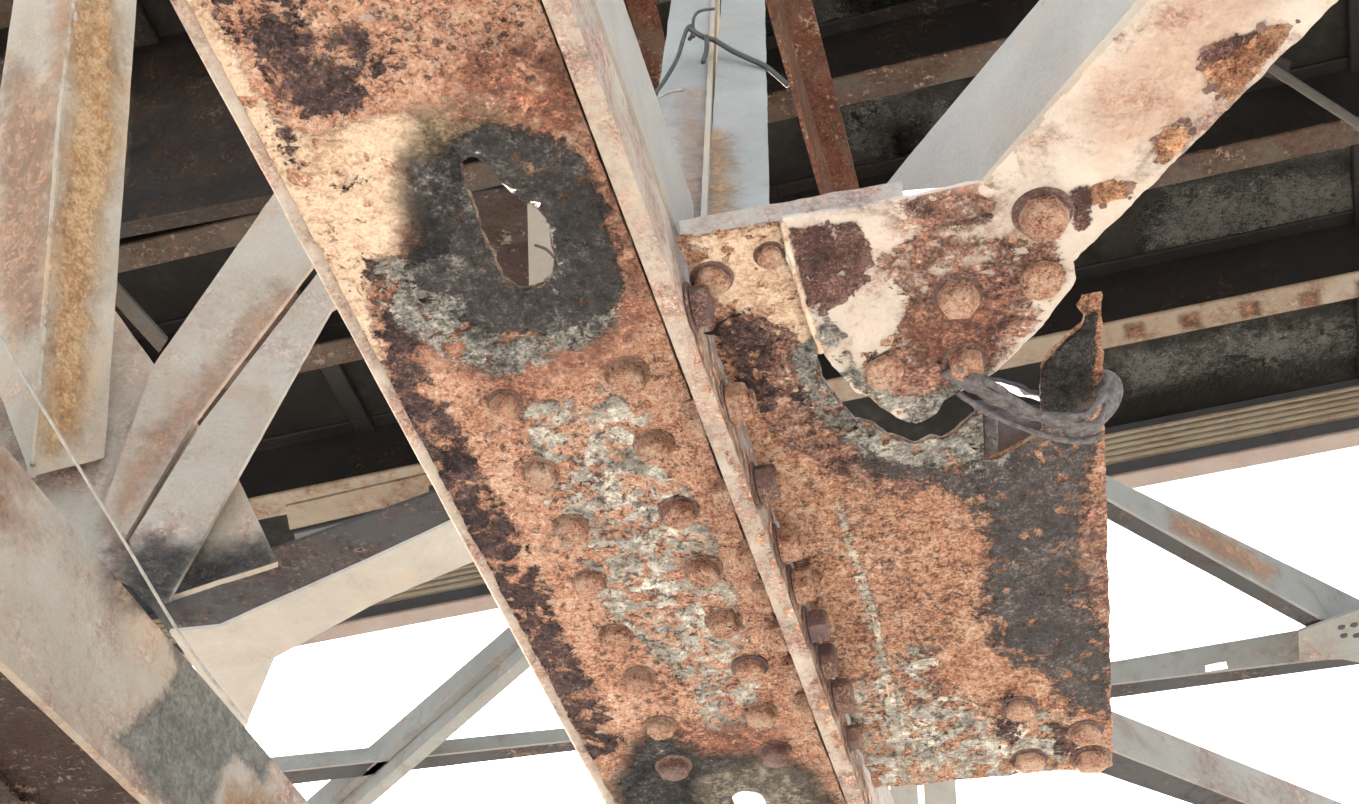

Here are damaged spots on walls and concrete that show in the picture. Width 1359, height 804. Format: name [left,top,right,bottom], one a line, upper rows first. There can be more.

corrosion [0,0,123,451]
peeling [187,0,566,395]
corrosion [379,175,643,383]
corrosion [450,42,577,130]
corrosion [681,119,736,215]
corrosion [853,183,1070,415]
corrosion [1069,179,1136,232]
corrosion [1149,117,1197,165]
corrosion [1195,19,1301,101]
corrosion [671,291,873,804]